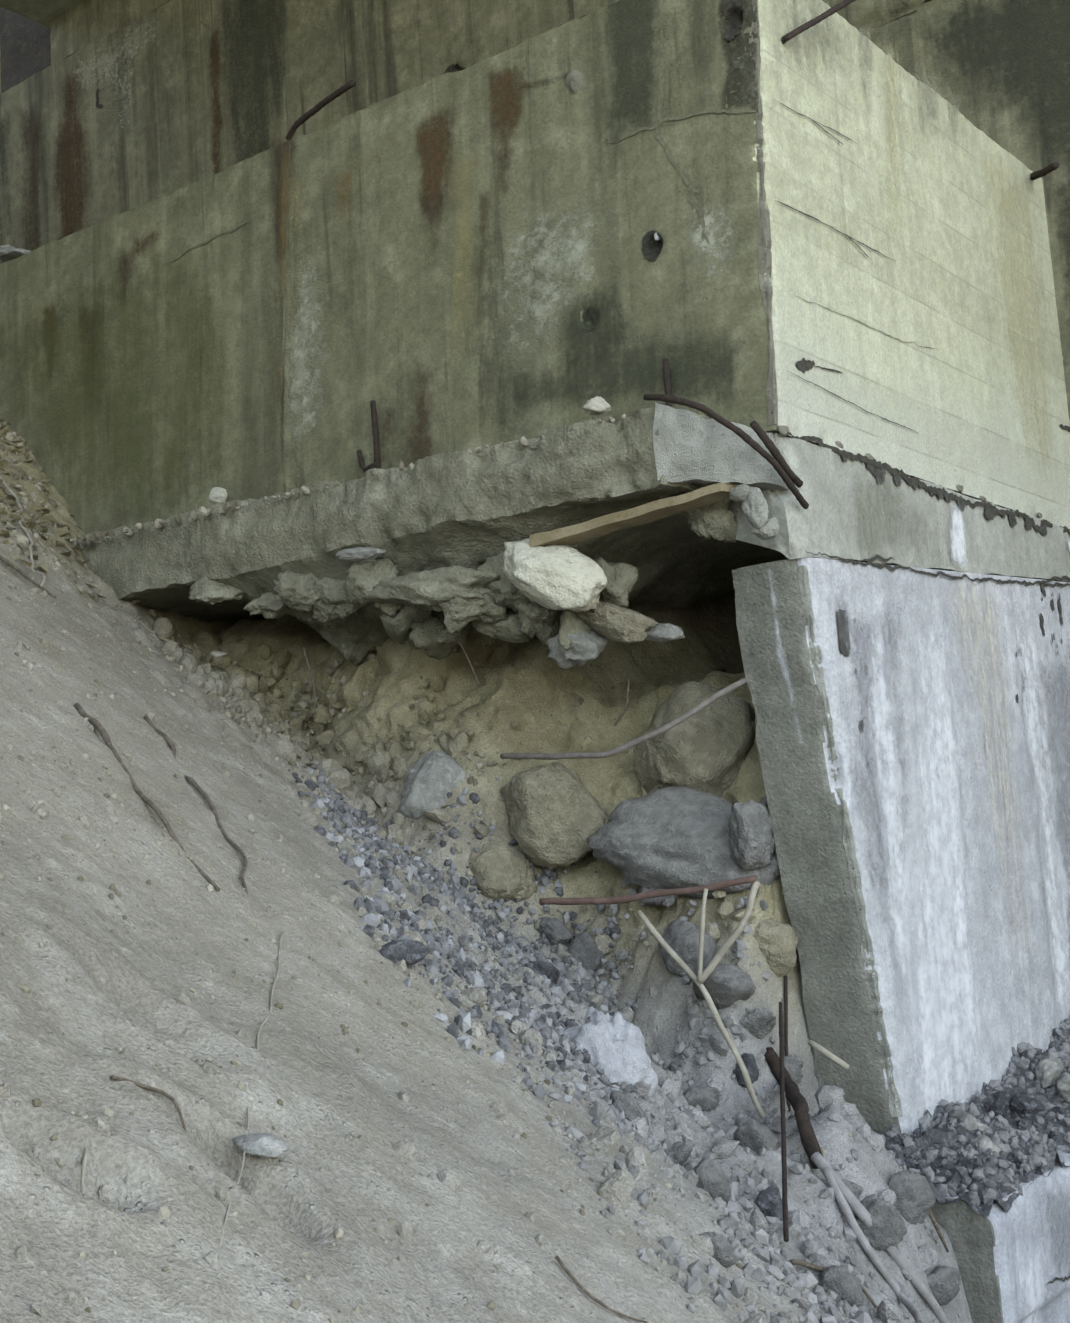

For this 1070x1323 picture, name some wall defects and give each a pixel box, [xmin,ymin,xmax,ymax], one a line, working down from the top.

rust [55,66,86,238]
water stain [223,0,285,163]
rust [417,115,449,228]
crack [605,20,853,245]
water stain [929,0,1070,282]
crack [786,370,920,434]
crack [777,425,1070,536]
crack [806,551,1070,587]
water stain [951,511,964,563]
crack [1047,1276,1070,1285]